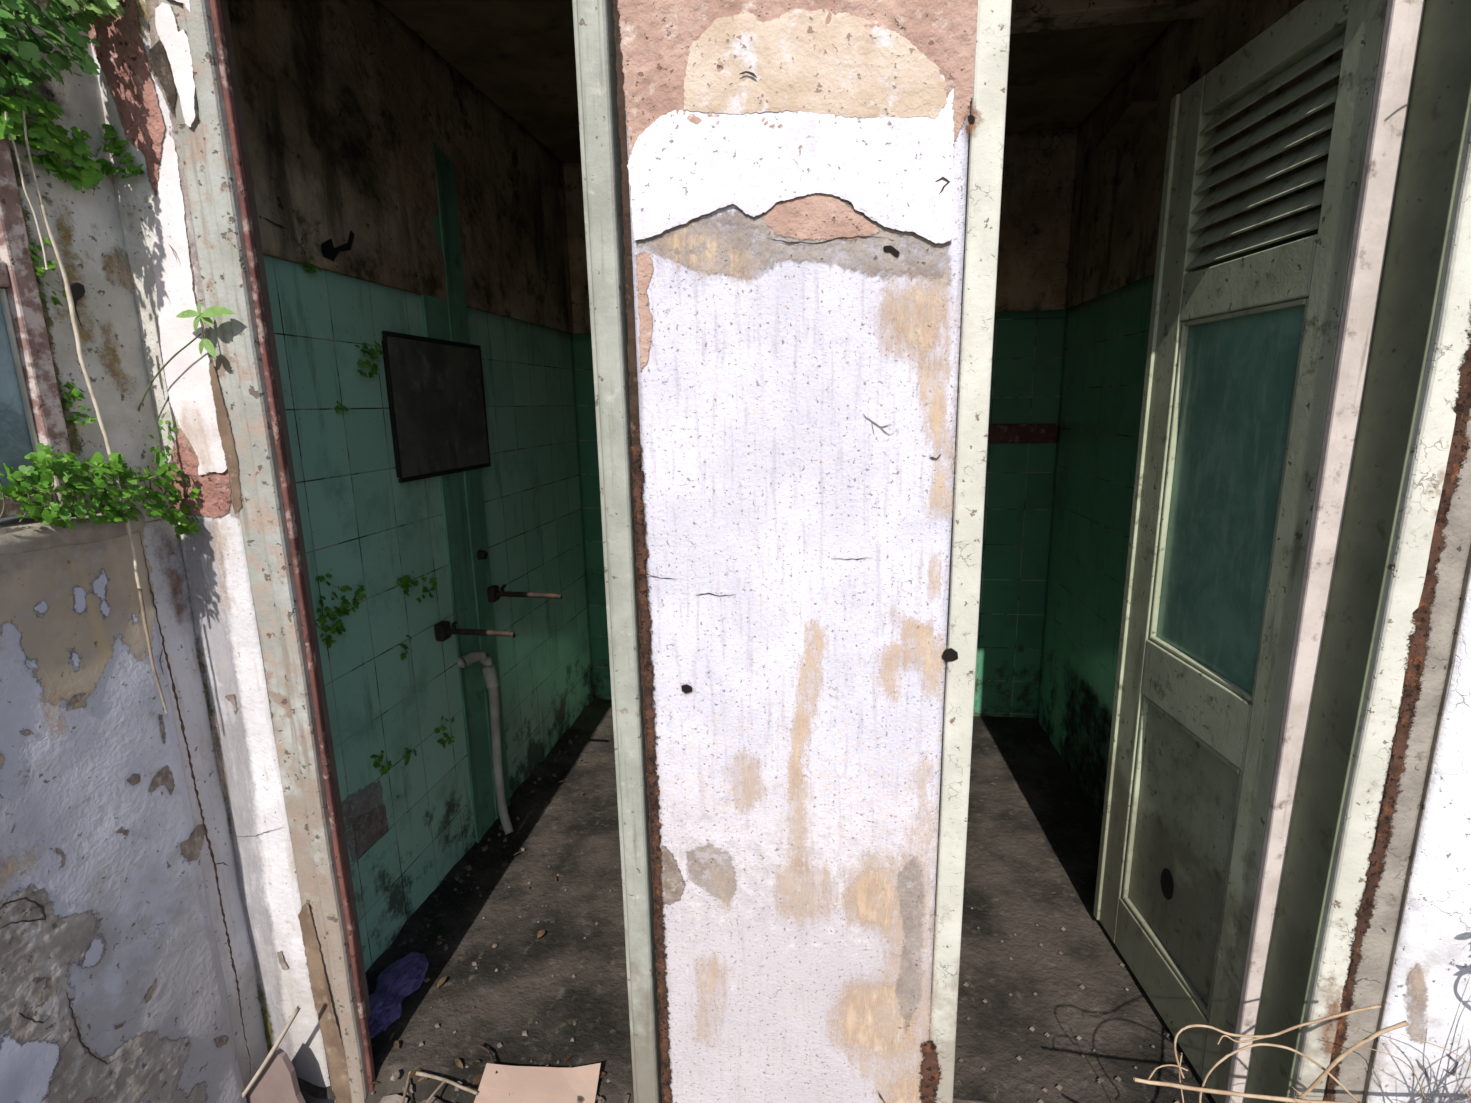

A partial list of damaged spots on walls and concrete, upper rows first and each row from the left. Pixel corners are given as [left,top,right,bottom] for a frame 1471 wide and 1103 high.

peeling [83,0,242,518]
flaking render [617,0,978,516]
peeling [0,532,158,737]
peeling [0,883,208,1103]
peeling [127,765,175,795]
peeling [181,824,206,862]
crack [139,532,282,1095]
corrosion [628,443,673,1103]
corrosion [1324,305,1471,1101]